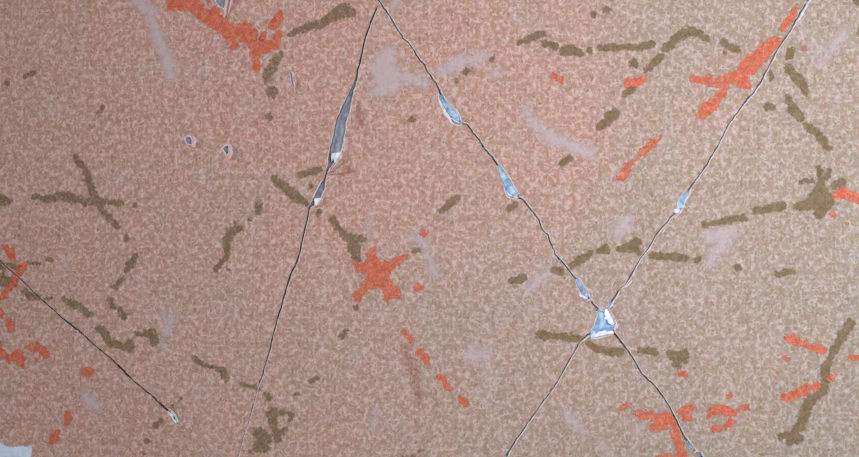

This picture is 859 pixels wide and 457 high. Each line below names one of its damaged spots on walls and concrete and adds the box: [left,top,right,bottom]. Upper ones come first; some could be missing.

leakage [31,154,137,241]
crack [196,0,815,457]
leakage [508,165,859,292]
crack [0,257,182,425]
leakage [778,318,859,446]
peeling [0,441,34,457]